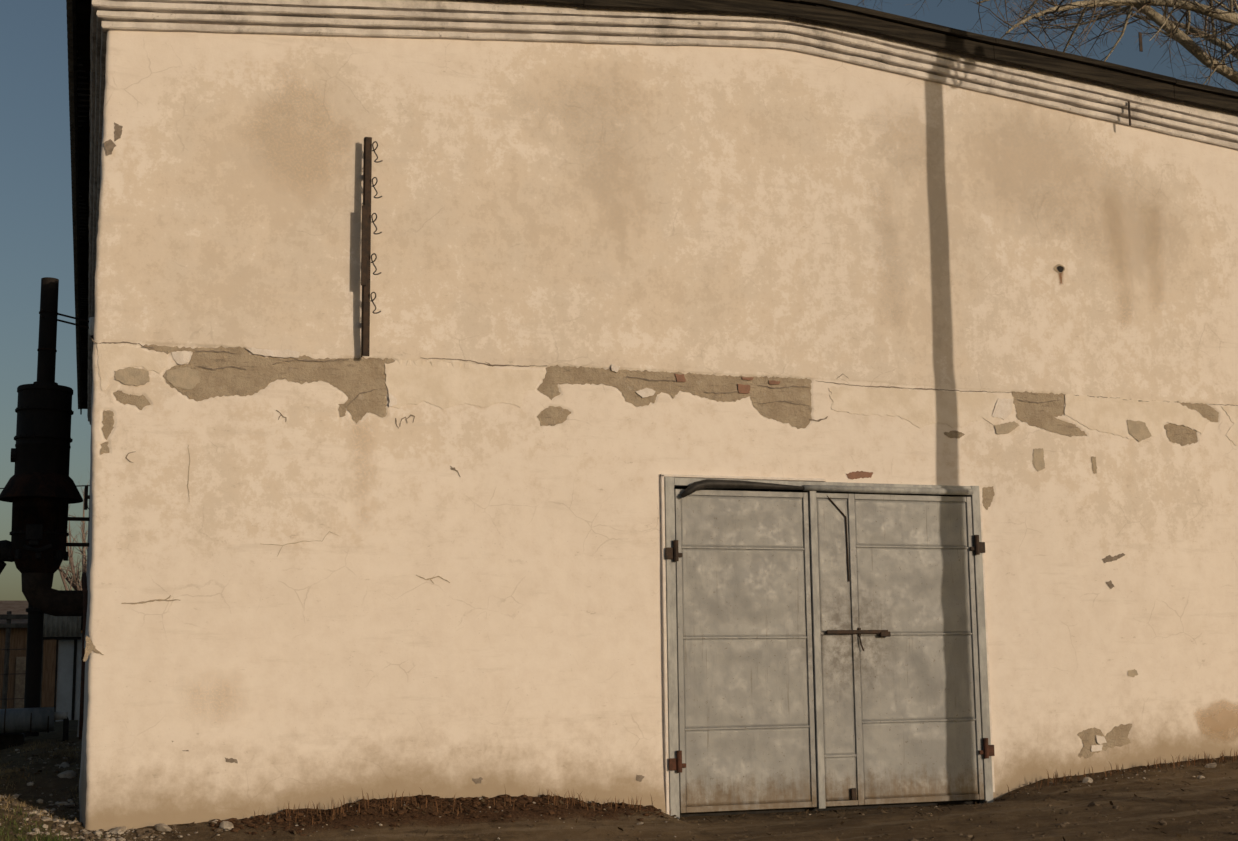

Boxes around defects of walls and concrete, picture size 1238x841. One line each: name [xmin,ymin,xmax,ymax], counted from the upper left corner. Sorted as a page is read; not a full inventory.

spalling [97,343,812,455]
peeling [992,391,1219,446]
peeling [1033,448,1045,471]
crack [122,595,178,604]
spalling [1077,723,1132,759]